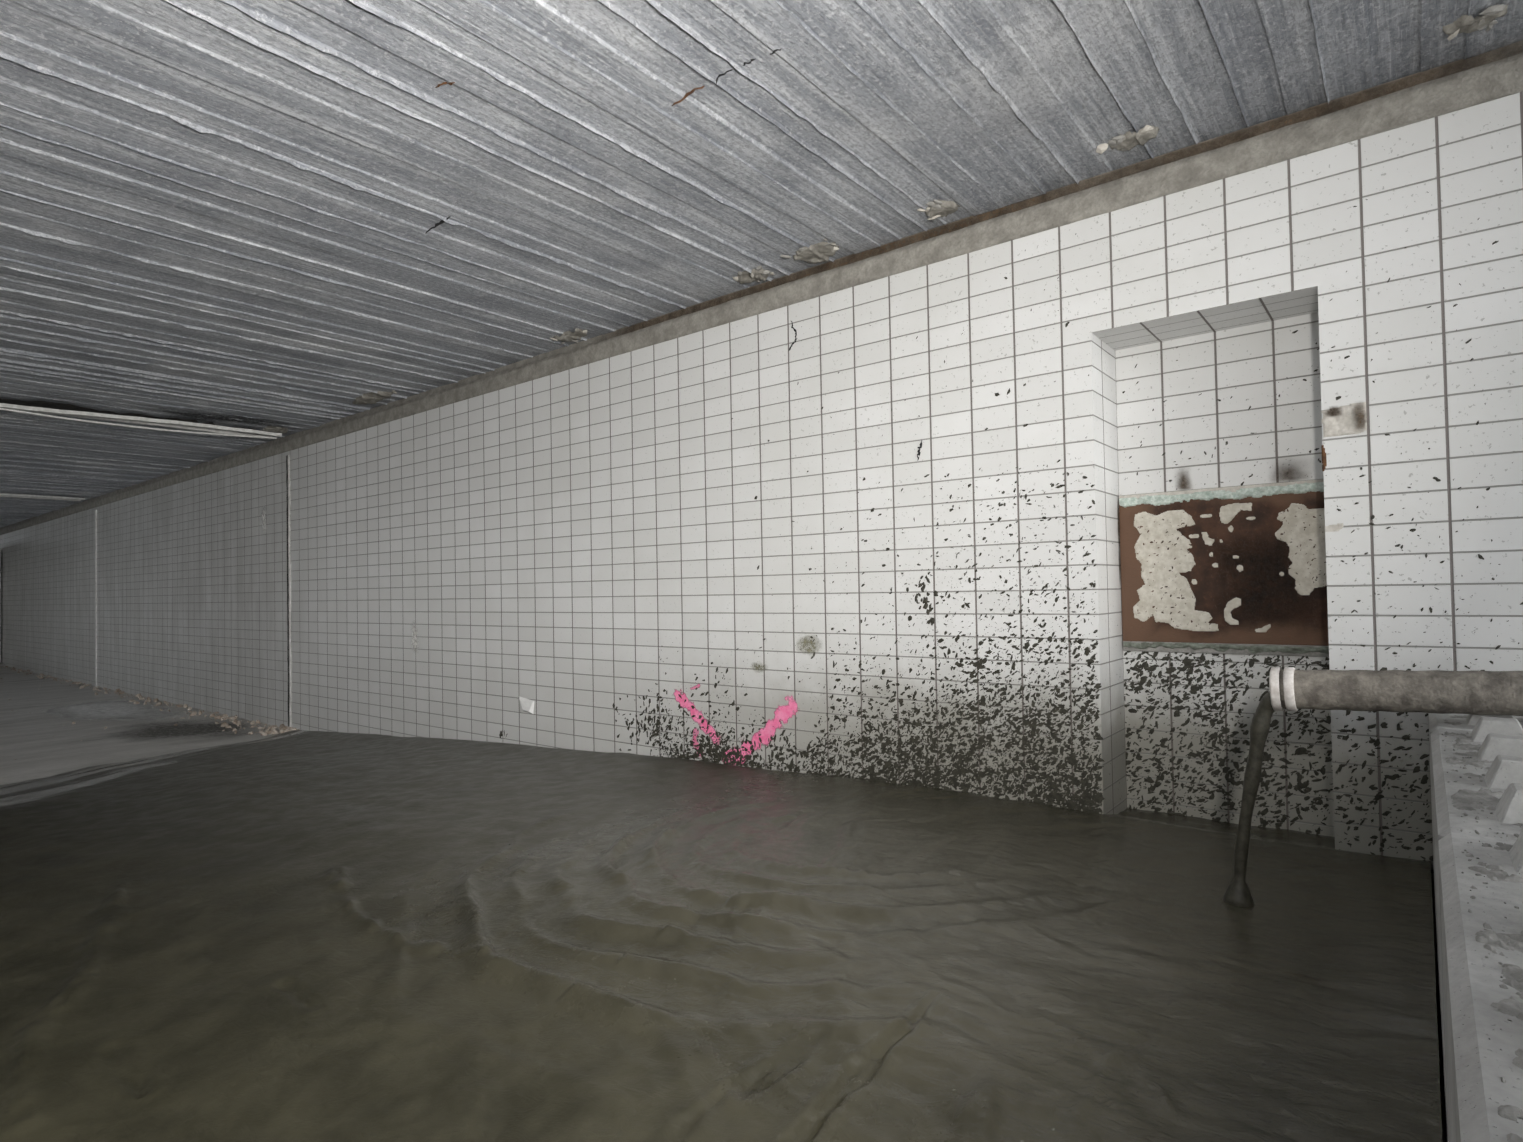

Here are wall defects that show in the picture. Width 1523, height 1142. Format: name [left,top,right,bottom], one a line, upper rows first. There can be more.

water stain [1281,467,1297,480]
corrosion [1118,507,1326,629]